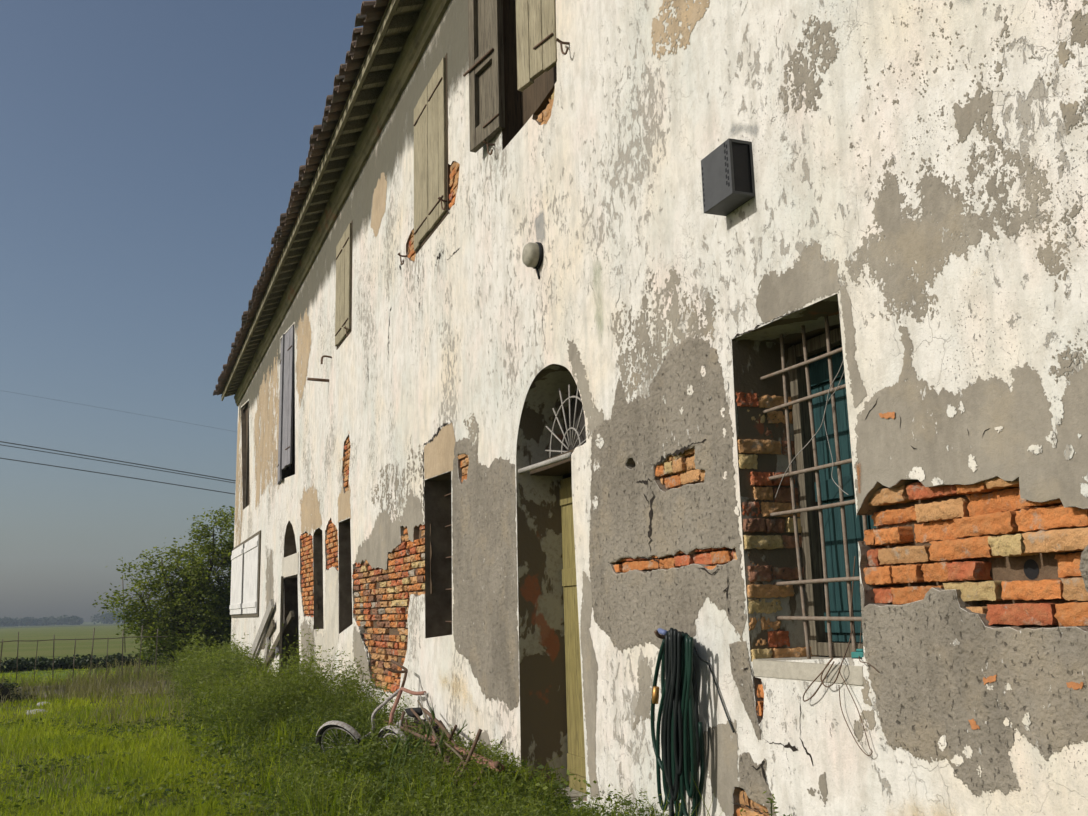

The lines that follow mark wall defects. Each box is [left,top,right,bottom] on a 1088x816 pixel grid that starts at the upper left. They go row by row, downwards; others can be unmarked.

peeling [651,0,710,60]
flaking render [756,0,1088,798]
flaking render [265,548,274,650]
flaking render [298,431,351,677]
flaking render [352,413,519,711]
flaking render [566,264,776,816]
peeling [807,772,828,807]